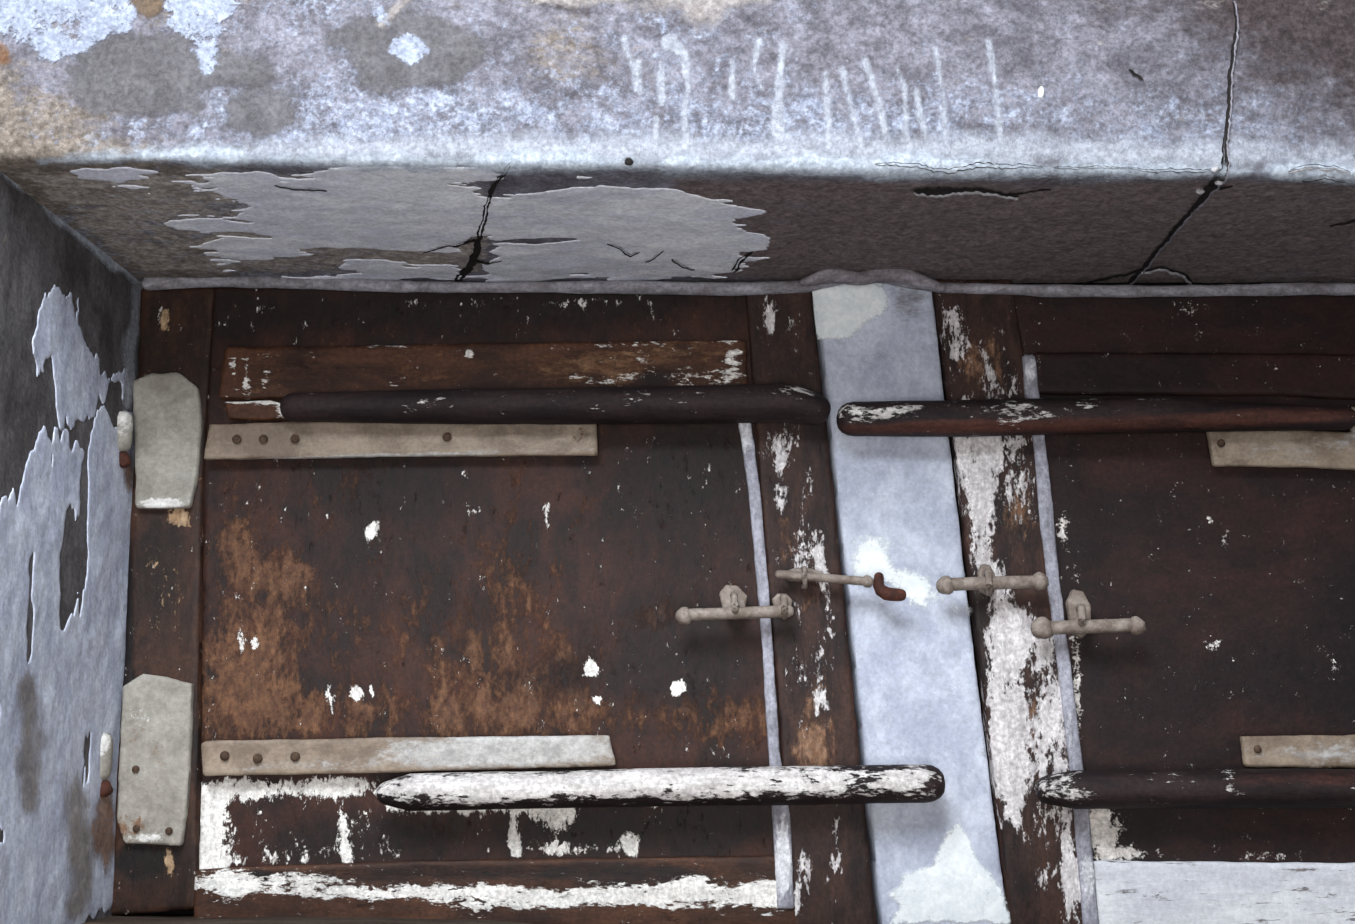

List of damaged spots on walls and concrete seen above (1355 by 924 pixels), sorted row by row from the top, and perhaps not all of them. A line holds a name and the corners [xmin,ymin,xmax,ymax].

leakage [130,0,164,18]
leakage [325,0,487,95]
leakage [532,0,628,13]
leakage [647,0,769,23]
leakage [40,30,1355,184]
crack [875,1,1240,285]
peeling [70,166,770,282]
crack [423,162,511,282]
peeling [0,284,135,924]